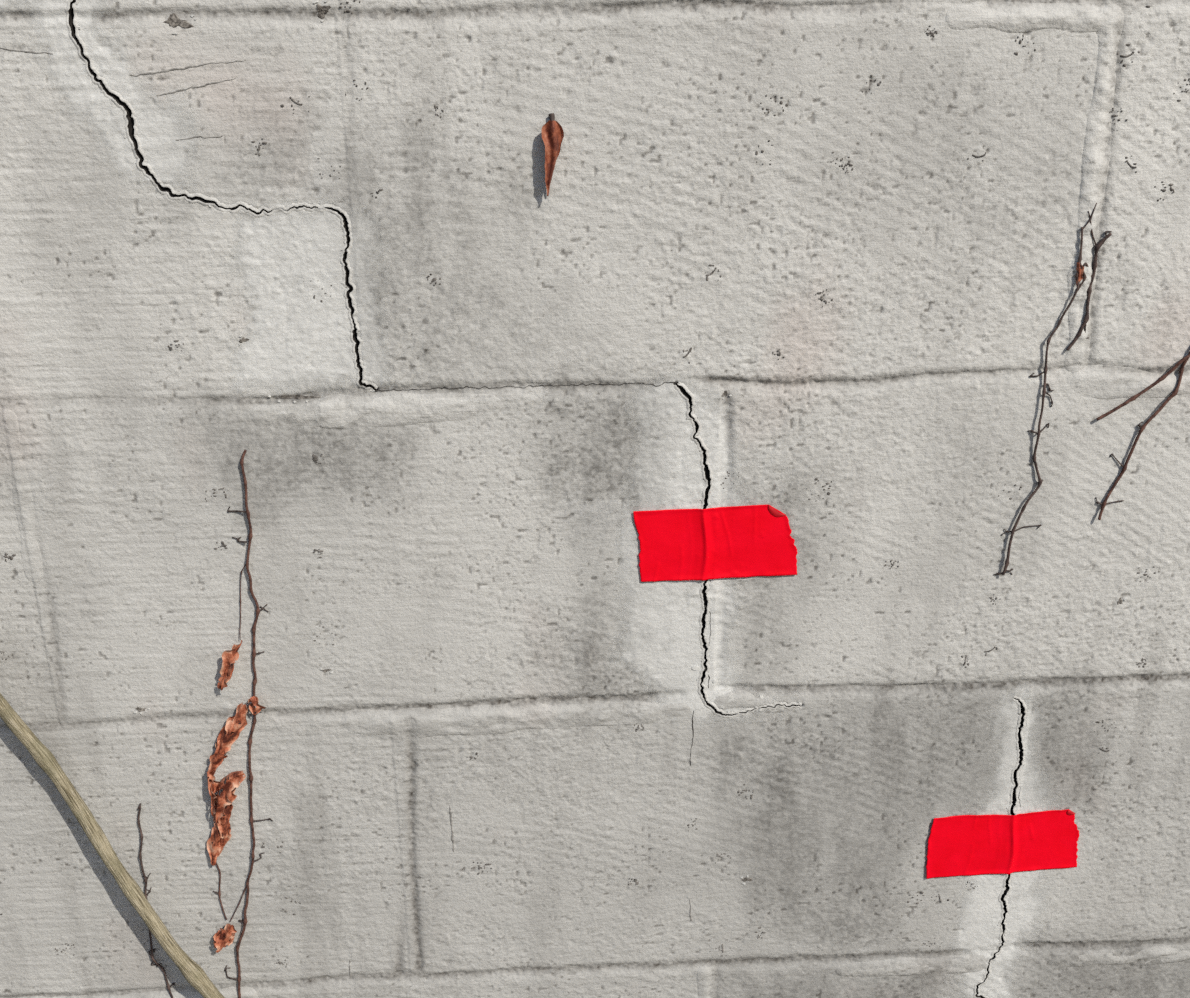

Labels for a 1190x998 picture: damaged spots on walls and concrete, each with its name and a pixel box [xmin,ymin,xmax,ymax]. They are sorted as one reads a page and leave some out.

crack [65,0,714,509]
crack [690,579,802,765]
crack [1007,695,1028,815]
crack [973,873,1013,998]